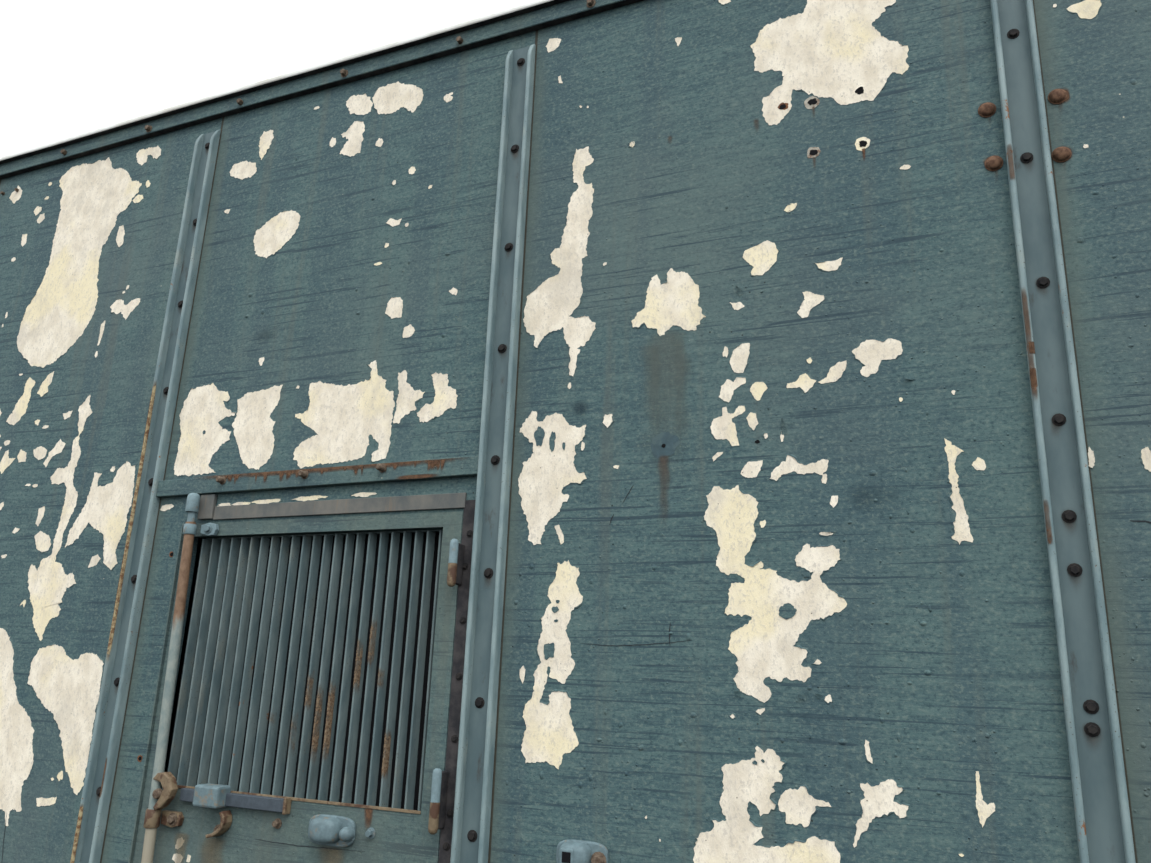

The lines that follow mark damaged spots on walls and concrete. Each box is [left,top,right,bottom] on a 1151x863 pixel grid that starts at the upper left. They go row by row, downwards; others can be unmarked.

peeling [750,0,910,126]
peeling [522,146,597,390]
peeling [0,145,162,827]
peeling [173,360,459,477]
corrosion [206,458,452,483]
peeling [518,410,588,546]
peeling [703,342,848,716]
corrosion [305,679,336,753]
corrosion [353,623,382,687]
corrosion [381,734,391,777]
peeling [519,559,584,770]
peeling [692,745,910,863]